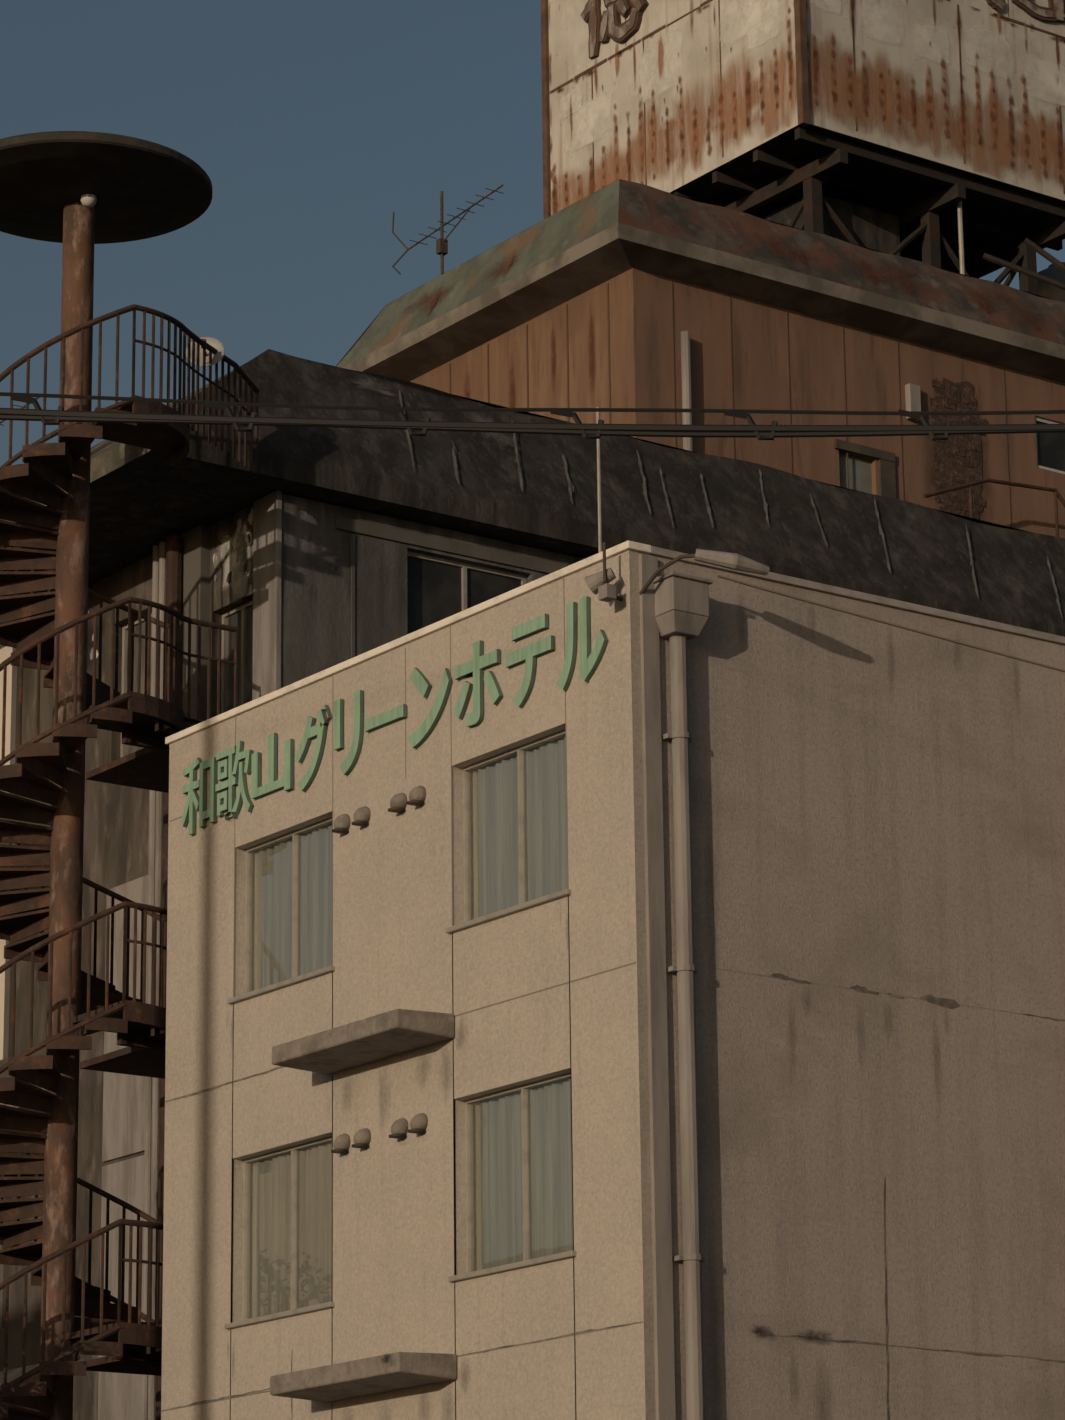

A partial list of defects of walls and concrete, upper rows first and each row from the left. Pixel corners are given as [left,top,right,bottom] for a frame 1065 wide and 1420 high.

rust [549,3,1065,214]
peeling [210,507,254,597]